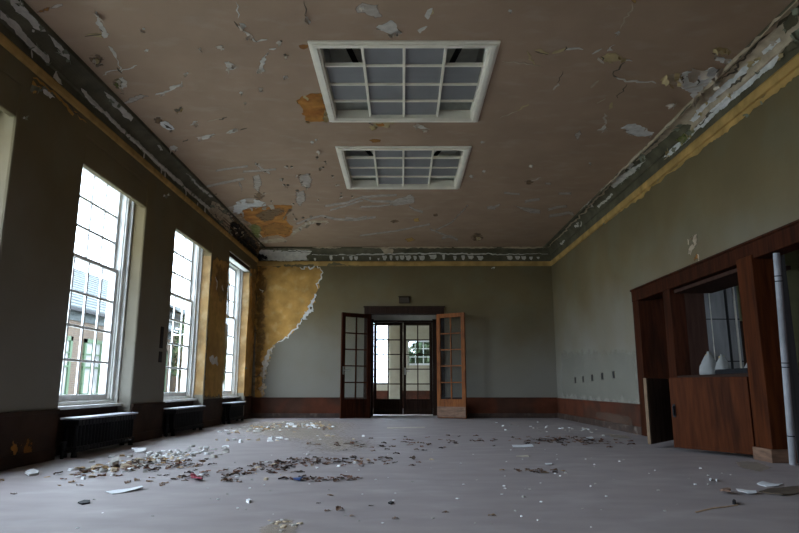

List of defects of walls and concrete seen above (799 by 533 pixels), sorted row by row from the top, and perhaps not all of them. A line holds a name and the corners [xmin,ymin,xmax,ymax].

flaking render [81,0,799,397]
crack [591,62,656,109]